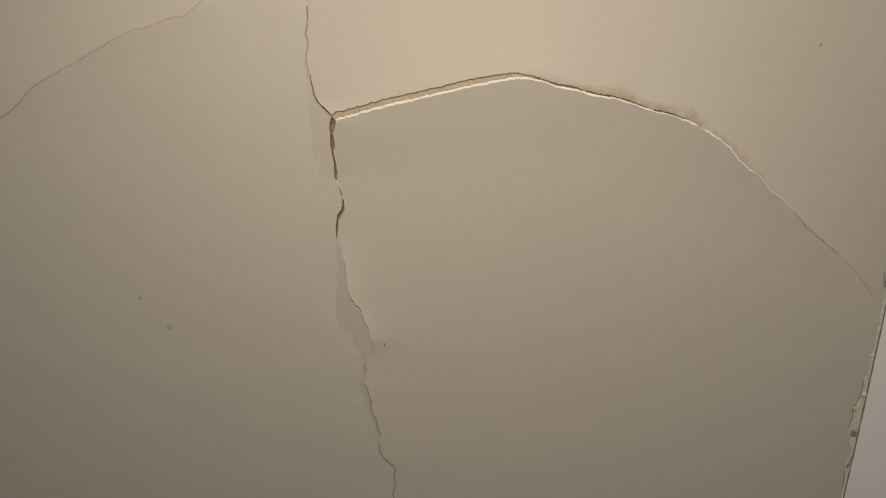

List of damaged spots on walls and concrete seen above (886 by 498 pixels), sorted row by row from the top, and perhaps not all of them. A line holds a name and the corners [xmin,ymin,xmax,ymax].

crack [0,1,202,118]
crack [303,6,311,72]
crack [324,72,699,497]
crack [772,193,886,498]
flaking render [840,269,886,498]